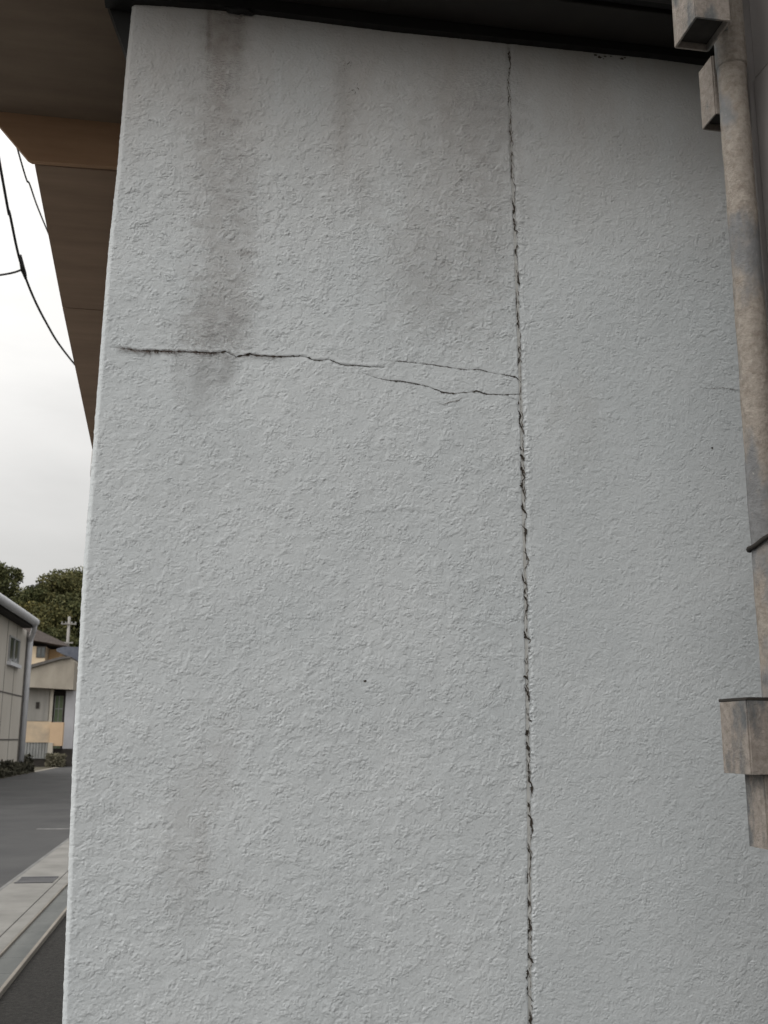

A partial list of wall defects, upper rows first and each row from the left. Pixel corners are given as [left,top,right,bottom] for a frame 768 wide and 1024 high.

crack [126,48,534,1024]